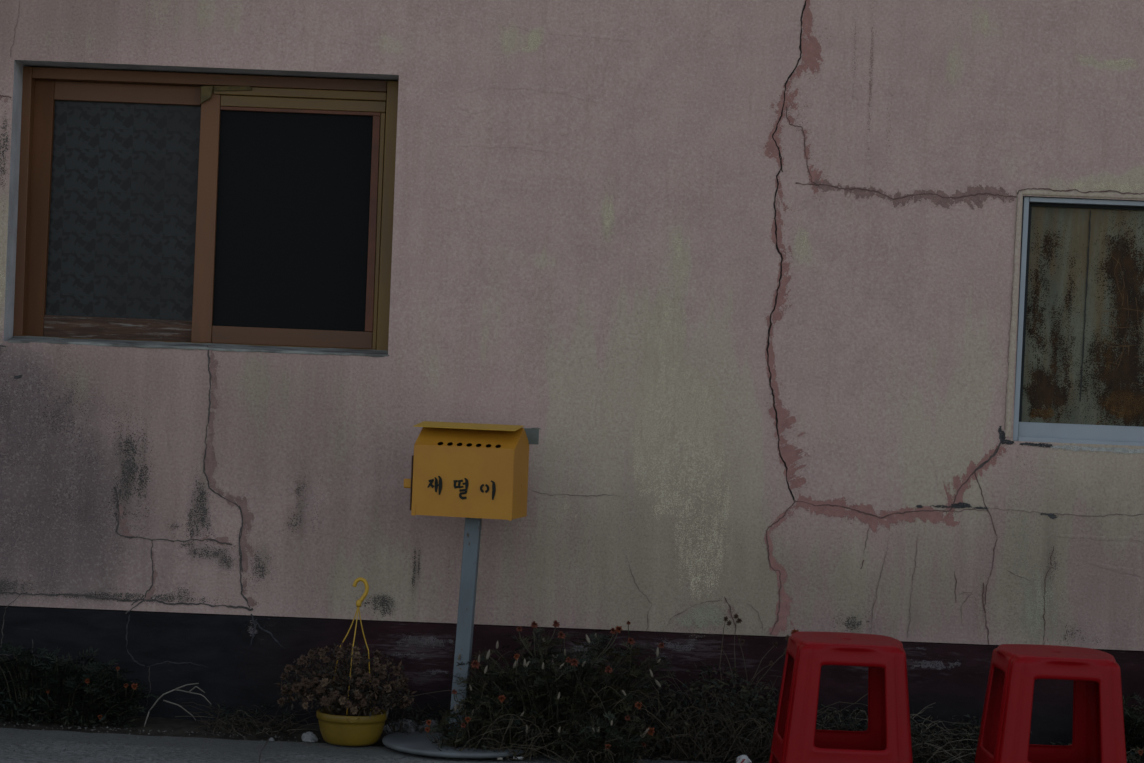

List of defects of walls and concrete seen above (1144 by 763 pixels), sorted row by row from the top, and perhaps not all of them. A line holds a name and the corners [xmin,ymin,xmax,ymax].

crack [626,0,1144,645]
rust [1022,218,1144,427]
leakage [0,369,151,591]
crack [0,345,285,703]
leakage [169,471,272,583]